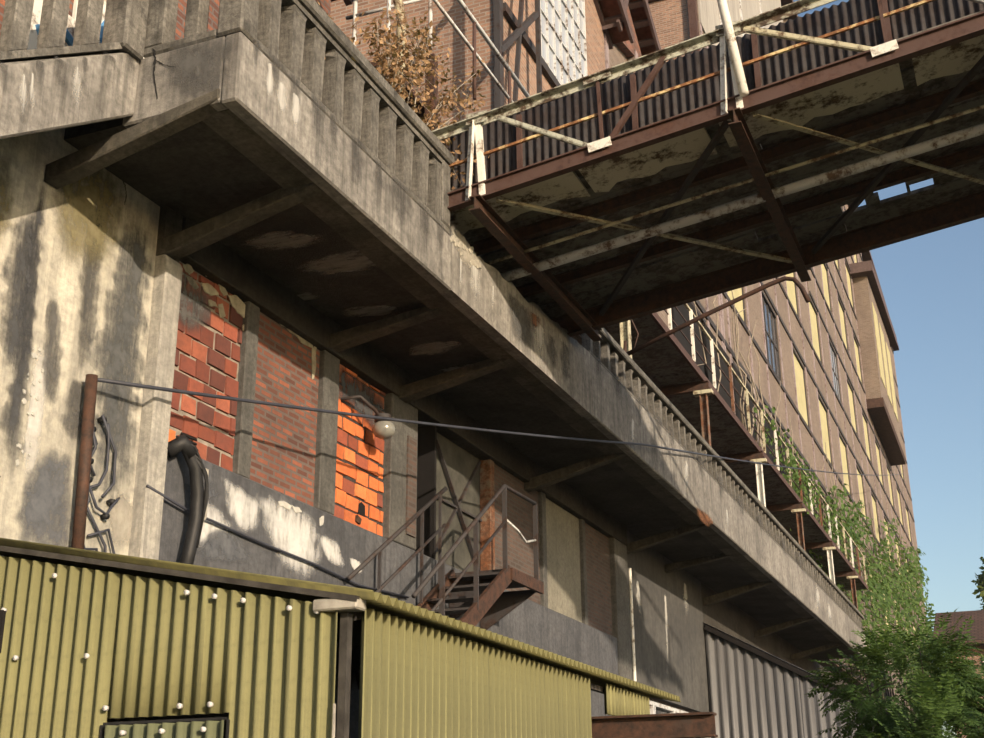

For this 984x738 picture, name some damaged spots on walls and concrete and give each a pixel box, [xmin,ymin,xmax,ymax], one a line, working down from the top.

leakage [1,191,44,454]
leakage [43,301,60,396]
leakage [80,225,151,489]
leakage [64,381,83,437]
leakage [200,529,250,562]